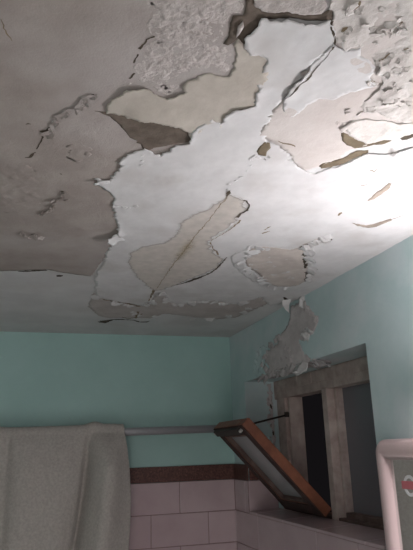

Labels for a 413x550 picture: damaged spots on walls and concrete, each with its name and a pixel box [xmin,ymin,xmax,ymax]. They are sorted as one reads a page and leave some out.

crack [99,191,250,323]
peeling [0,0,413,385]